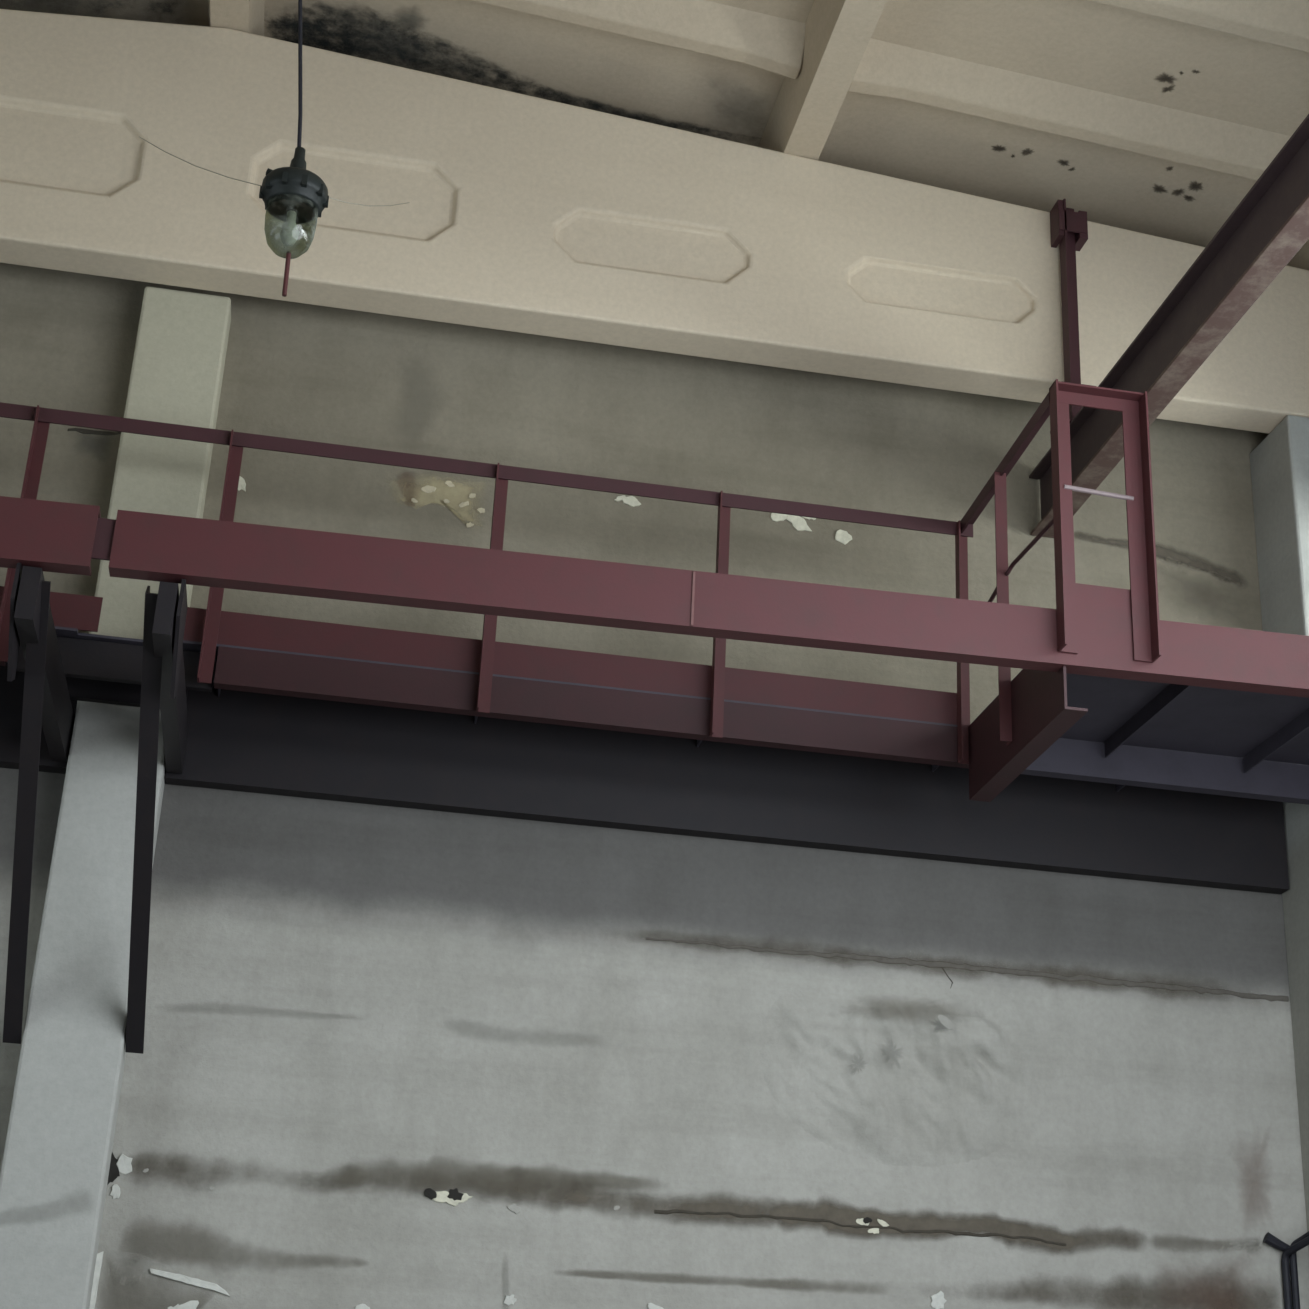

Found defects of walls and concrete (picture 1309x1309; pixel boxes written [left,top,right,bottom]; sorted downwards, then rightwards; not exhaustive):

damp [275,5,709,134]
peeling [402,479,485,528]
peeling [770,513,816,532]
peeling [835,530,852,545]
damp [134,1158,190,1178]
damp [411,1175,1139,1252]
peeling [89,1252,103,1309]
peeling [150,1269,230,1309]
peeling [930,1291,947,1309]
damp [1009,1286,1059,1300]
damp [1075,1281,1273,1309]